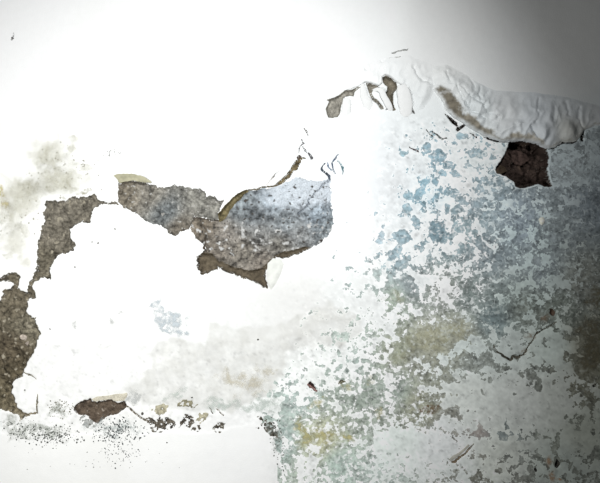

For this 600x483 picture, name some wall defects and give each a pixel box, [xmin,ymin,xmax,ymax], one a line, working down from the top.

flaking render [0,174,334,421]
peeling [257,122,600,483]
crack [493,322,556,361]
mould [3,399,85,449]
flaking render [73,393,127,428]
mould [93,414,149,469]
flaking render [146,399,208,433]